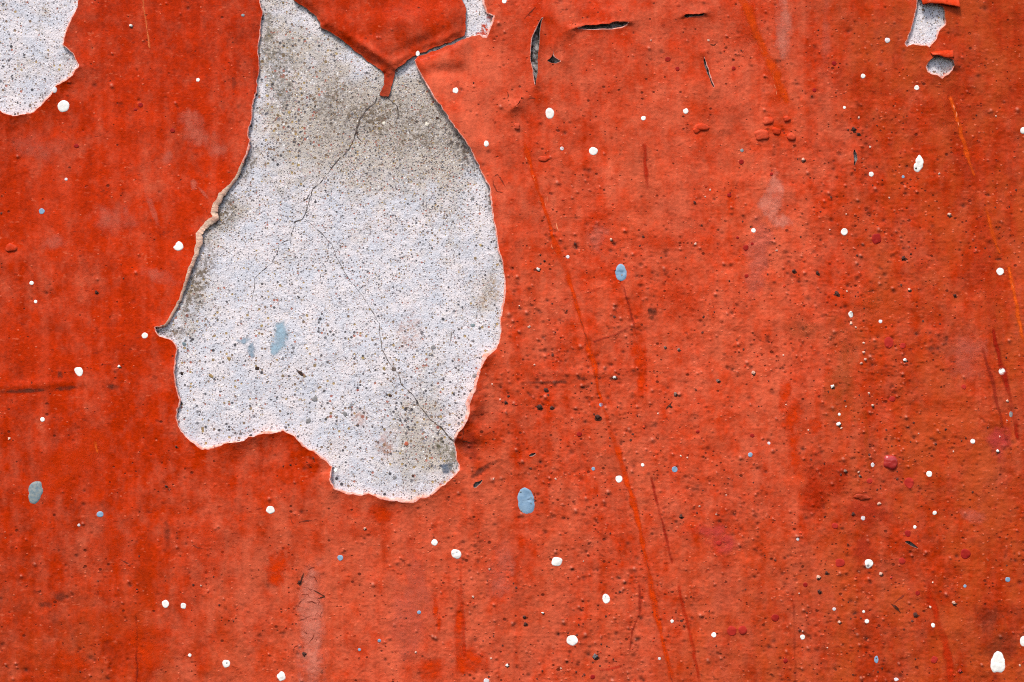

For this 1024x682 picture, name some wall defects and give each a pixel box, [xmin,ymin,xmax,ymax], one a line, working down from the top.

peeling [0,0,79,116]
peeling [905,0,960,79]
peeling [154,0,506,503]
crack [252,97,471,443]